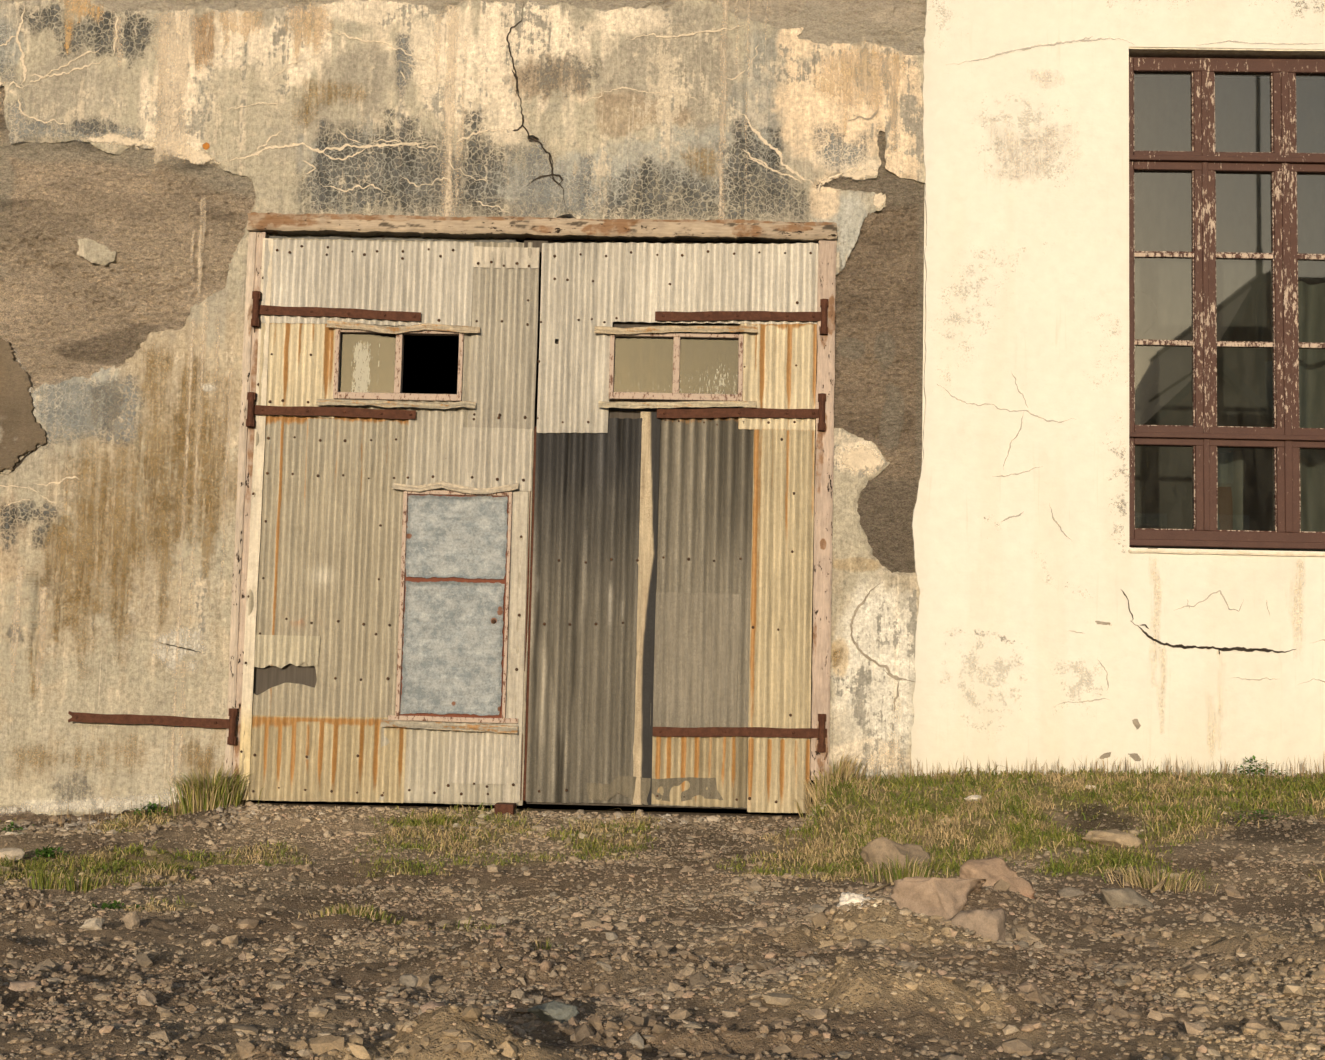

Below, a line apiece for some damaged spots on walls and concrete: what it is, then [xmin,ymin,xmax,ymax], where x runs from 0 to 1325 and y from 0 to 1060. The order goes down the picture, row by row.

spalling [96,0,341,12]
spalling [361,0,680,14]
spalling [702,0,926,56]
crack [506,1,570,214]
spalling [0,85,256,393]
spalling [816,131,925,573]
crack [937,371,1074,477]
water stain [0,321,232,813]
crack [1001,509,1070,539]
crack [850,583,915,712]
crack [1123,590,1325,684]